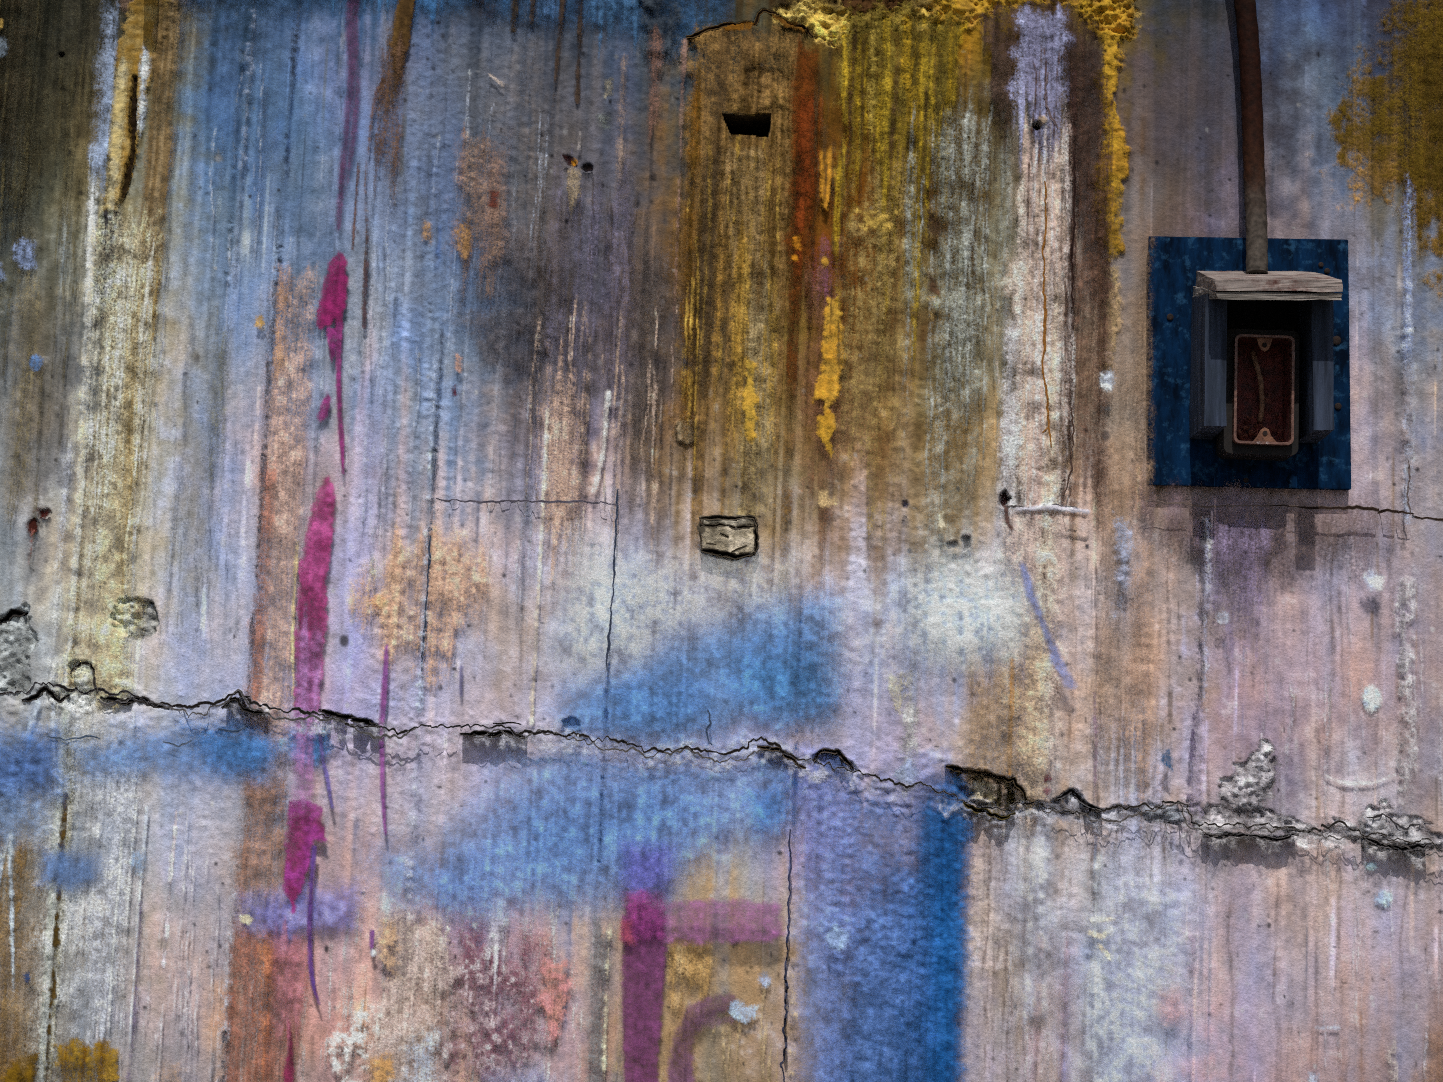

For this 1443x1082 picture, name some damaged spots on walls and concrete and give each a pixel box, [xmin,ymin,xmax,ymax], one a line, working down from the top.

spalling [772,0,956,48]
corrosion [1328,0,1443,256]
corrosion [668,26,844,604]
crack [1146,460,1443,521]
crack [0,609,28,624]
spalling [0,603,38,694]
spalling [196,691,615,752]
crack [0,661,1443,857]
spalling [938,739,1443,868]